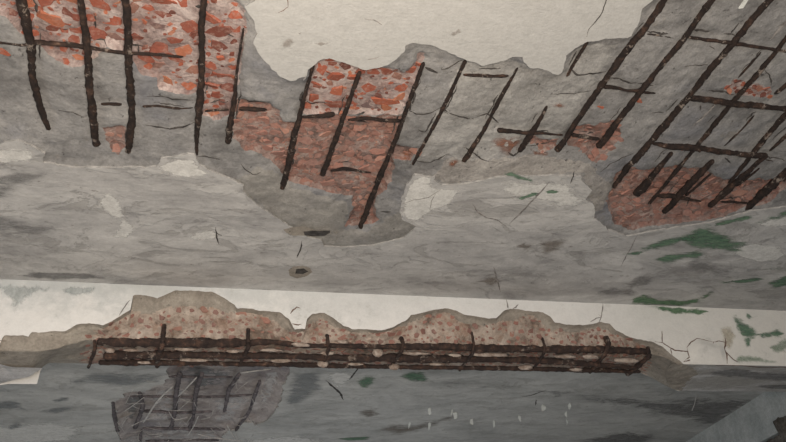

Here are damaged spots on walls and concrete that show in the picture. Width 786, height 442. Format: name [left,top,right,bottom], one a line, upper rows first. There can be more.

spalling [0,0,786,246]
water stain [629,235,726,273]
peeling [736,244,784,262]
water stain [725,276,786,287]
spalling [0,290,698,442]
crack [660,334,786,368]
water stain [758,330,786,351]